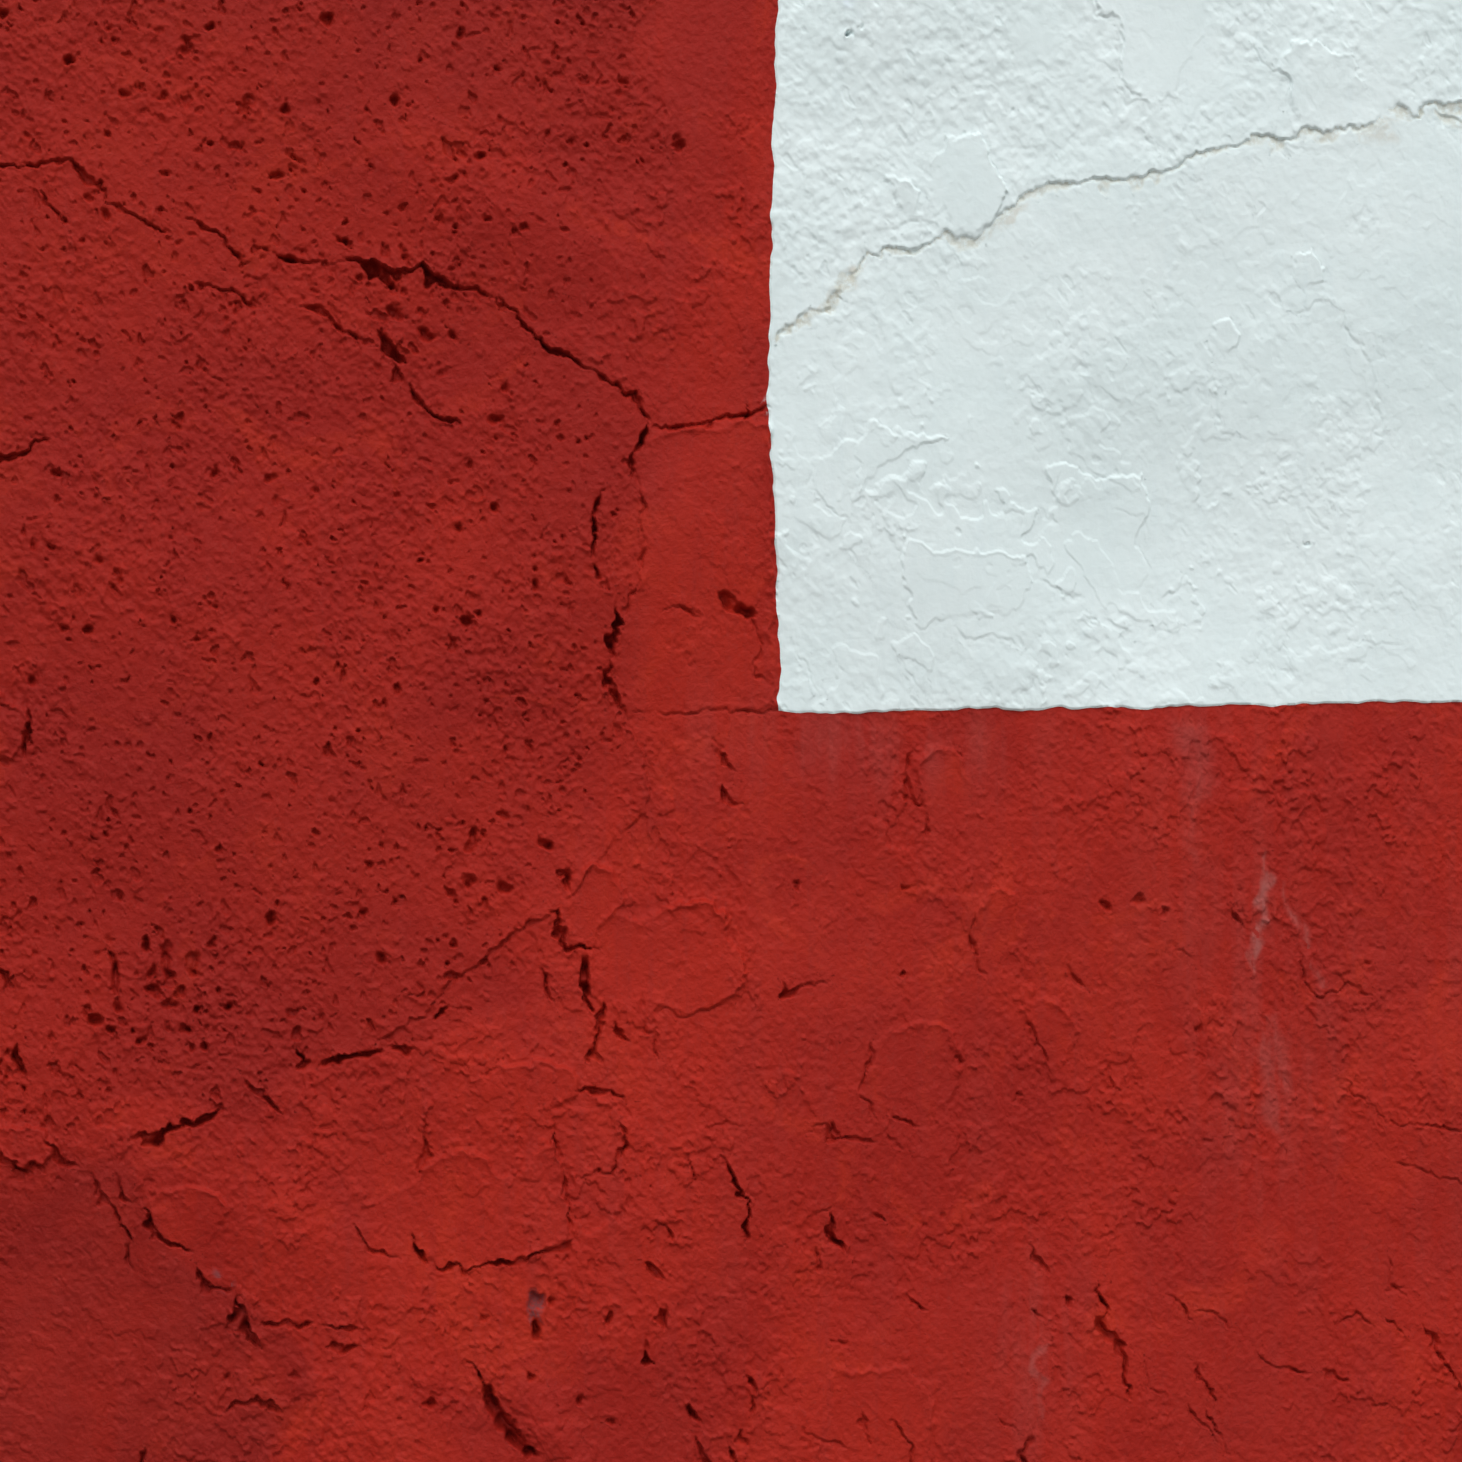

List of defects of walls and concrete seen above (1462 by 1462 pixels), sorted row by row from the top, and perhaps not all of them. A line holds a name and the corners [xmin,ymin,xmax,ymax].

crack [769,0,1462,345]
crack [0,146,781,730]
crack [778,972,837,1001]
crack [0,979,461,1357]
crack [351,864,736,1279]
crack [685,1105,763,1251]
crack [804,1040,928,1156]
crack [215,1389,290,1419]
crack [641,1211,692,1369]
crack [685,1366,923,1462]
crack [1092,1274,1399,1461]
crack [1331,1250,1462,1395]